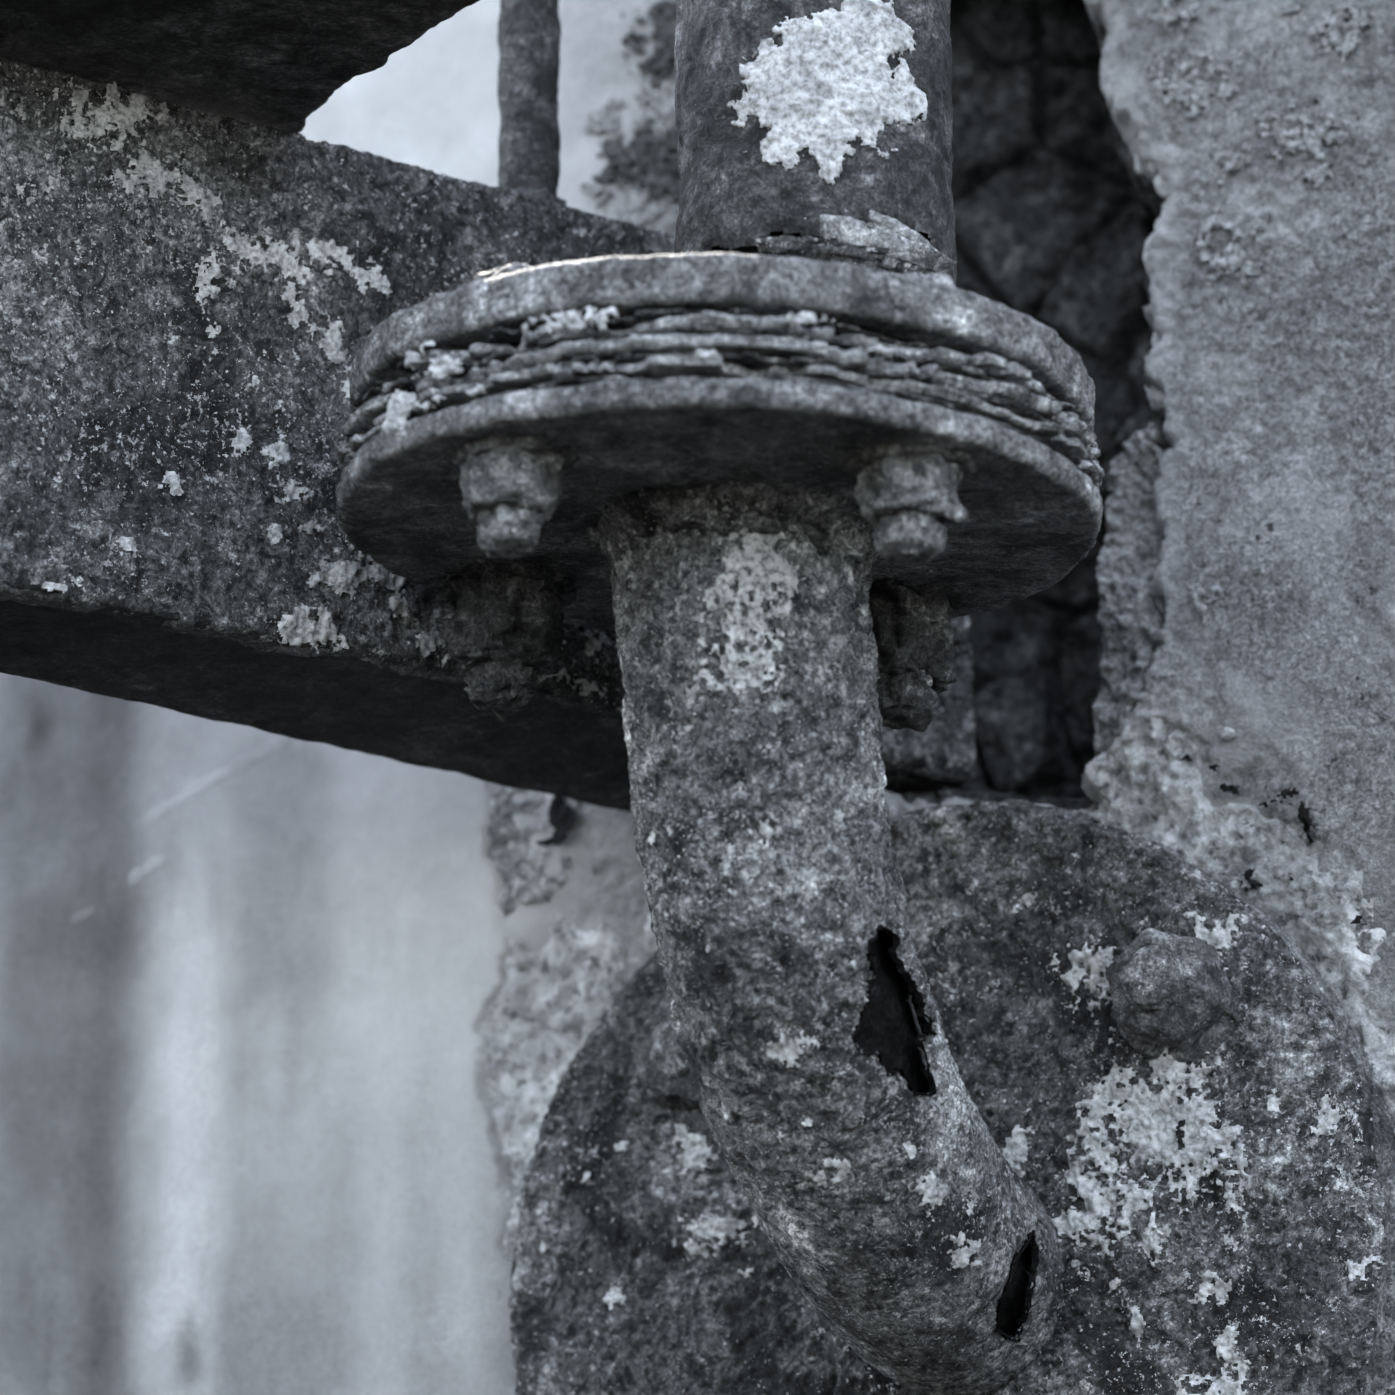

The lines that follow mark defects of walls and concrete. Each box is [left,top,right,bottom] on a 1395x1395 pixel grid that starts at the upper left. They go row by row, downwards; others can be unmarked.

corrosion [755,210,957,275]
spalling [898,0,1395,1132]